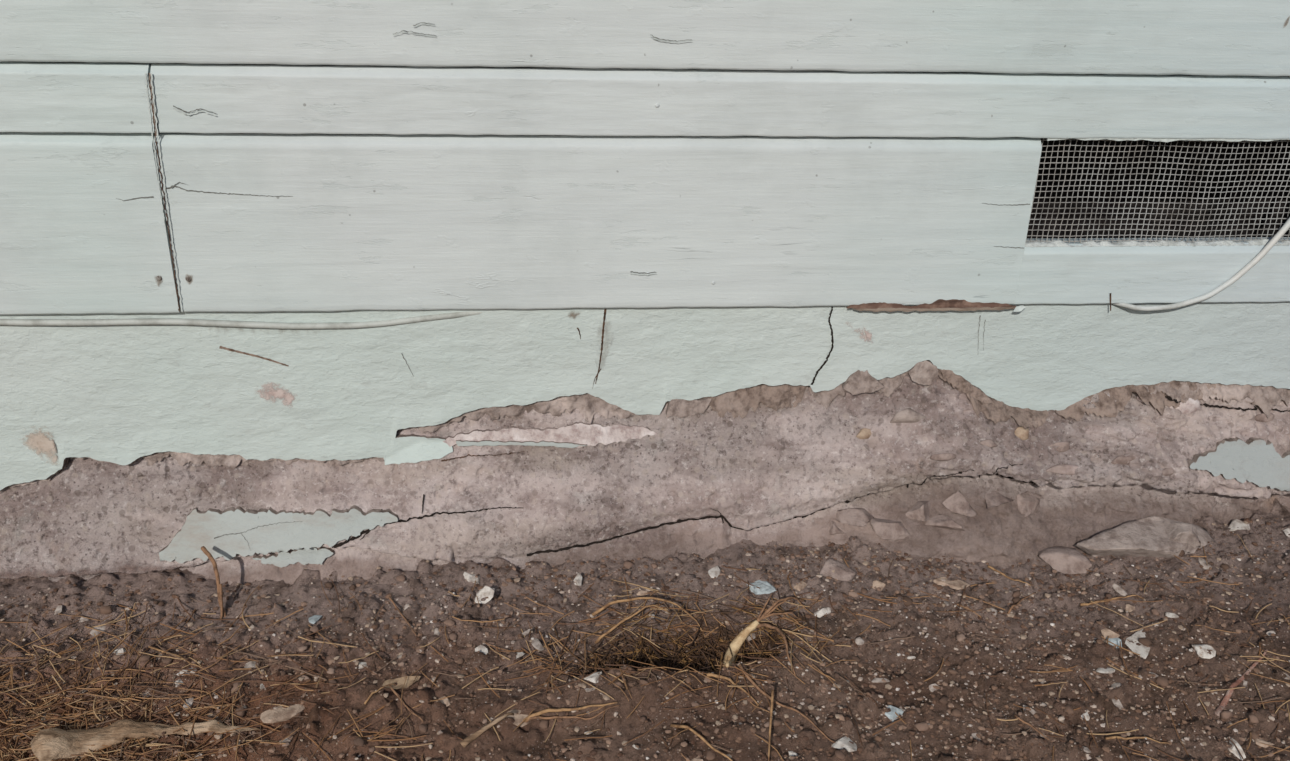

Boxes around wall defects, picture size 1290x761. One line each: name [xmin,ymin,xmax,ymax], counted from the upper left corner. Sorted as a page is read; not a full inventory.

crack [577,309,606,389]
crack [809,307,834,385]
crack [441,451,524,462]
spalling [0,360,1290,585]
crack [906,463,1036,488]
crack [332,494,520,548]
crack [527,493,875,556]